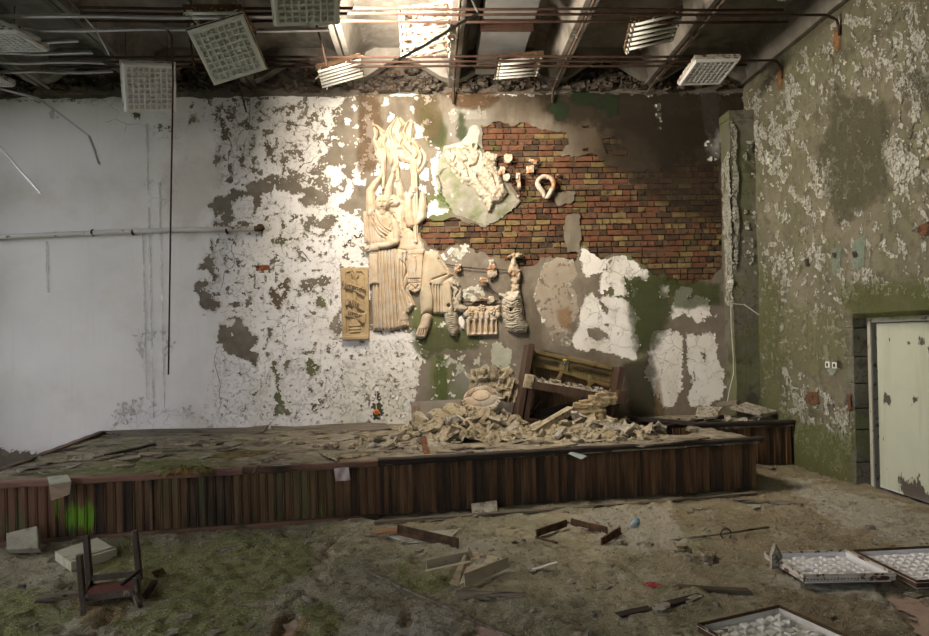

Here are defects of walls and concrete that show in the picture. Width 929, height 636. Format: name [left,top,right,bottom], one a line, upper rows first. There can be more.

spalling [176,0,929,440]
damp [824,88,886,223]